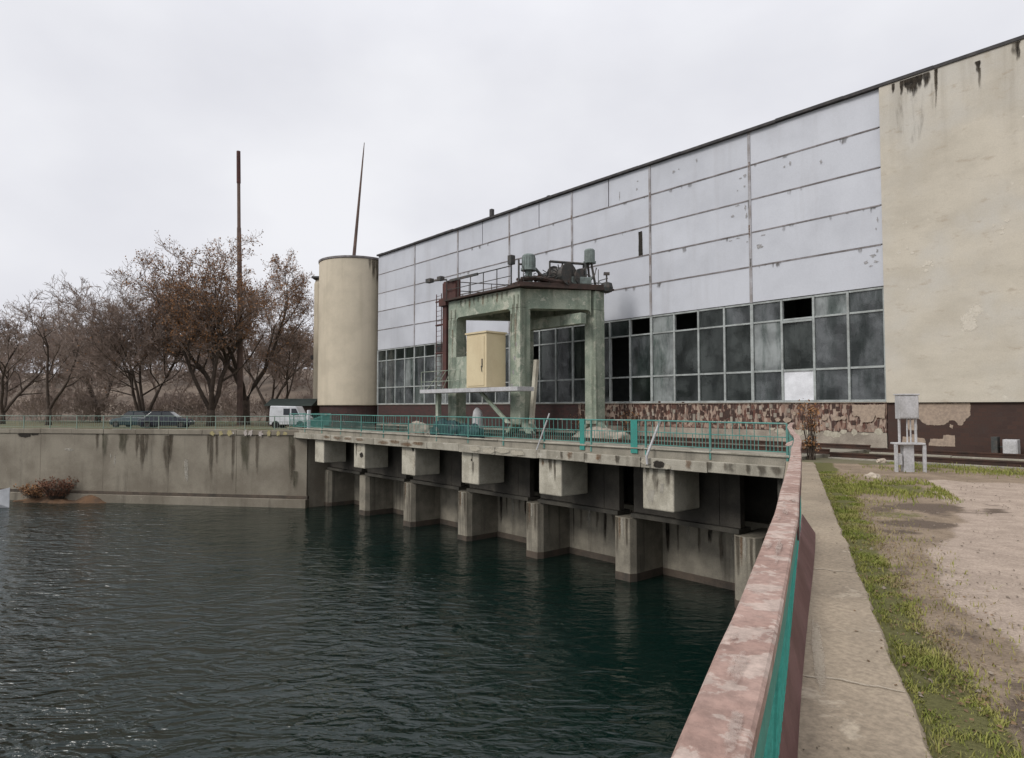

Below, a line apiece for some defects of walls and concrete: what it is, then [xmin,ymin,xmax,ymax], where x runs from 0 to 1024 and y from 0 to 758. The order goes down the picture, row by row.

damp [892,69,938,94]
spalling [902,403,971,447]
damp [120,434,148,463]
damp [164,434,173,464]
damp [207,435,218,464]
damp [232,435,259,465]